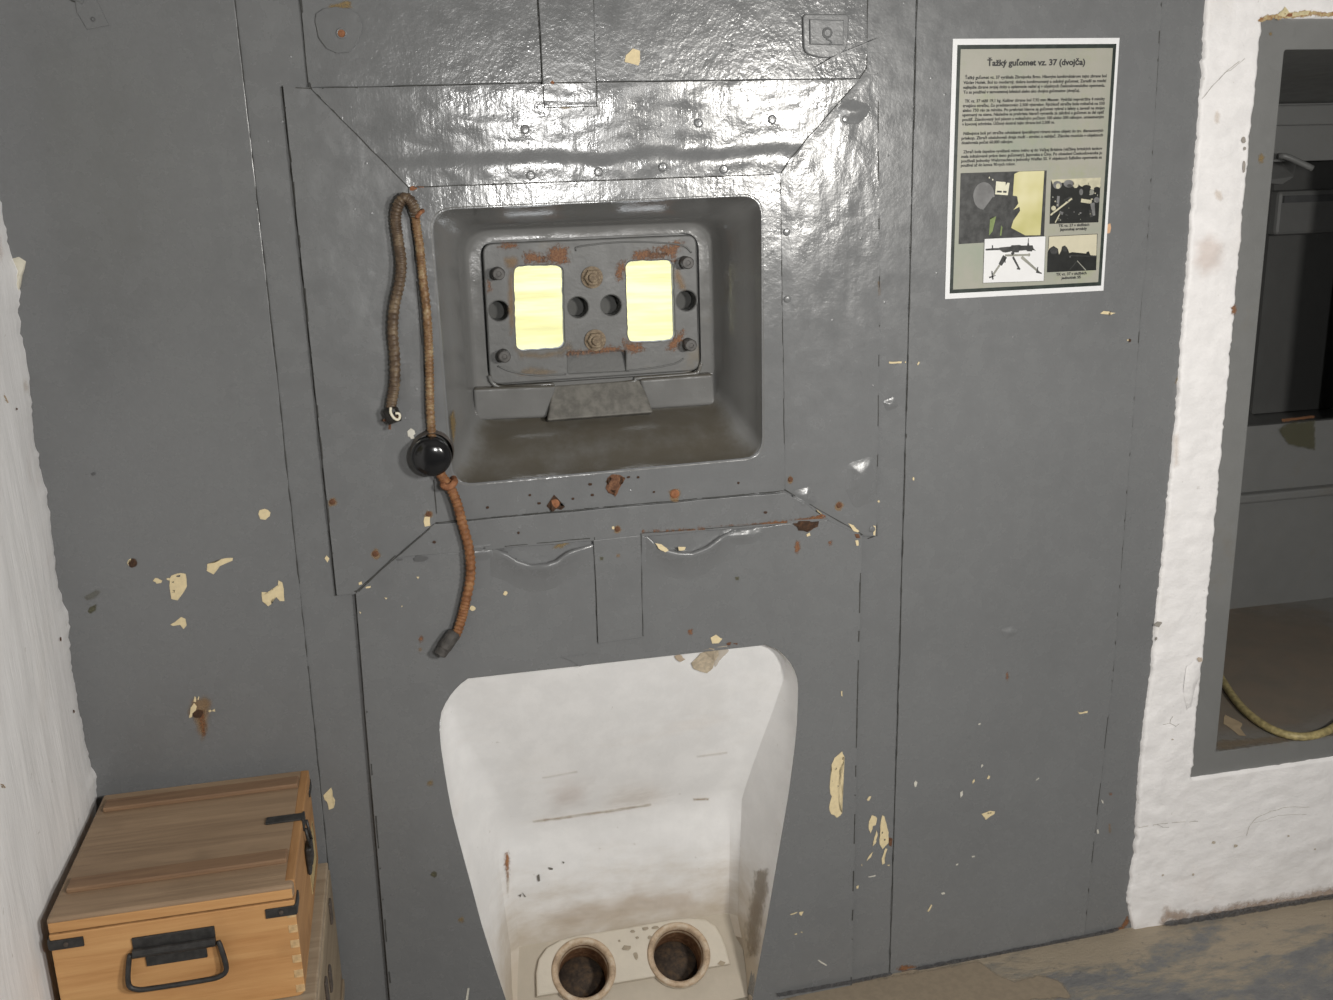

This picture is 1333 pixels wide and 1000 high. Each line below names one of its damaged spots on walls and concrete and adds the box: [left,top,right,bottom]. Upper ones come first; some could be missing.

rust [501,242,569,264]
rust [616,241,680,282]
rust [567,338,643,357]
rust [606,474,625,496]
rust [547,495,565,512]
peeling [207,558,233,574]
peeling [153,573,187,600]
peeling [262,580,284,606]
spalling [674,635,737,673]
peeling [829,752,845,818]
peeling [856,796,893,889]